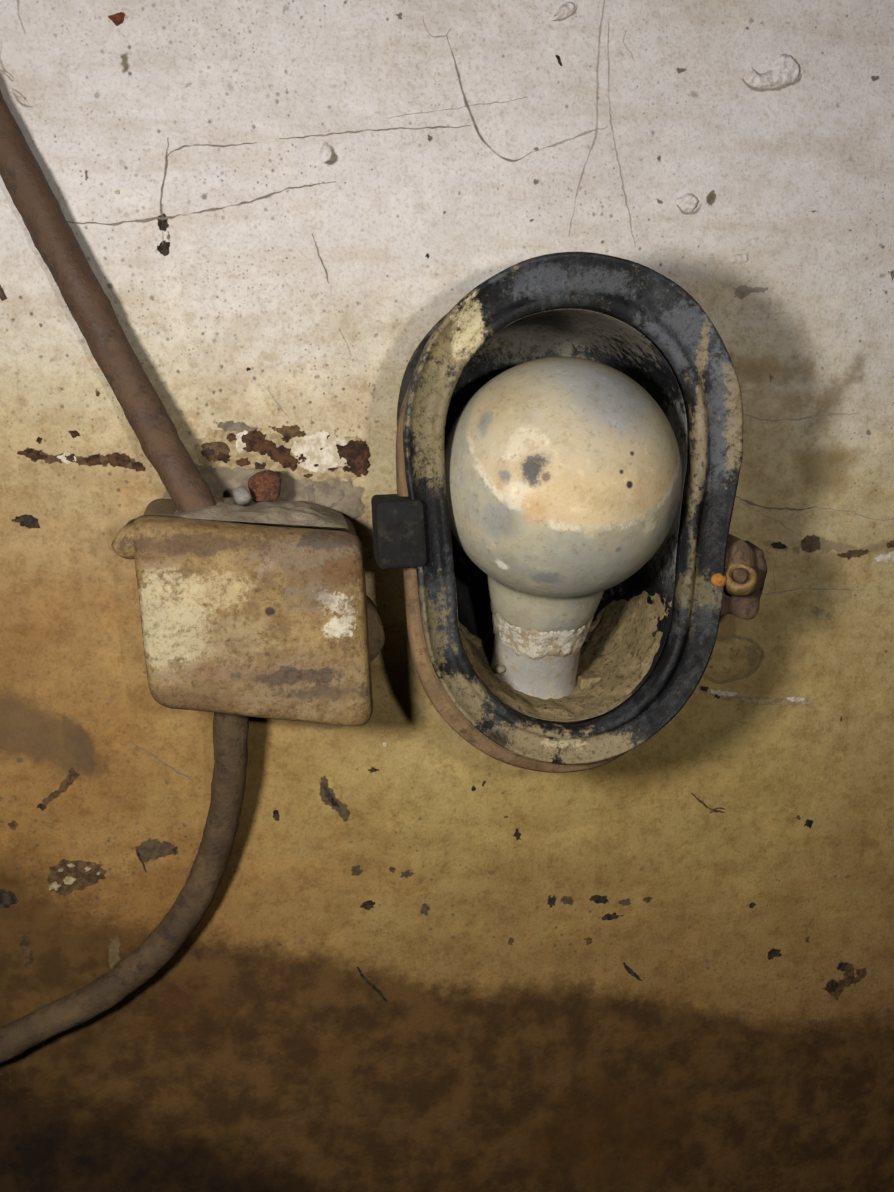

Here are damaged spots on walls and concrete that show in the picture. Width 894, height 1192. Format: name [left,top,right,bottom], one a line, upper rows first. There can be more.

crack [67,25,635,256]
peeling [195,420,370,483]
spalling [766,535,894,562]
spalling [47,859,106,896]
spalling [0,889,18,908]
spalling [823,962,866,1000]